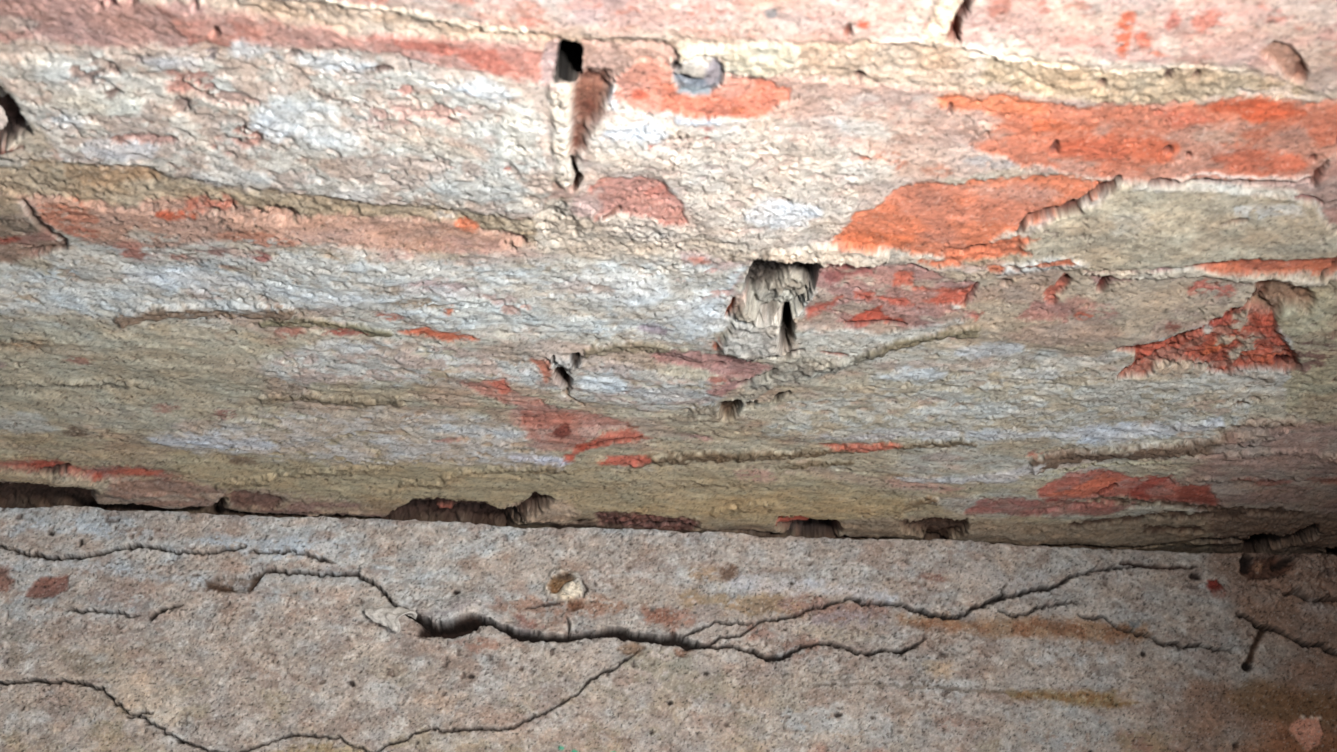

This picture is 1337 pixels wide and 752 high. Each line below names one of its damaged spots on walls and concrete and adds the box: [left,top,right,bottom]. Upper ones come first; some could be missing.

peeling [0,34,1337,519]
crack [0,499,1337,752]